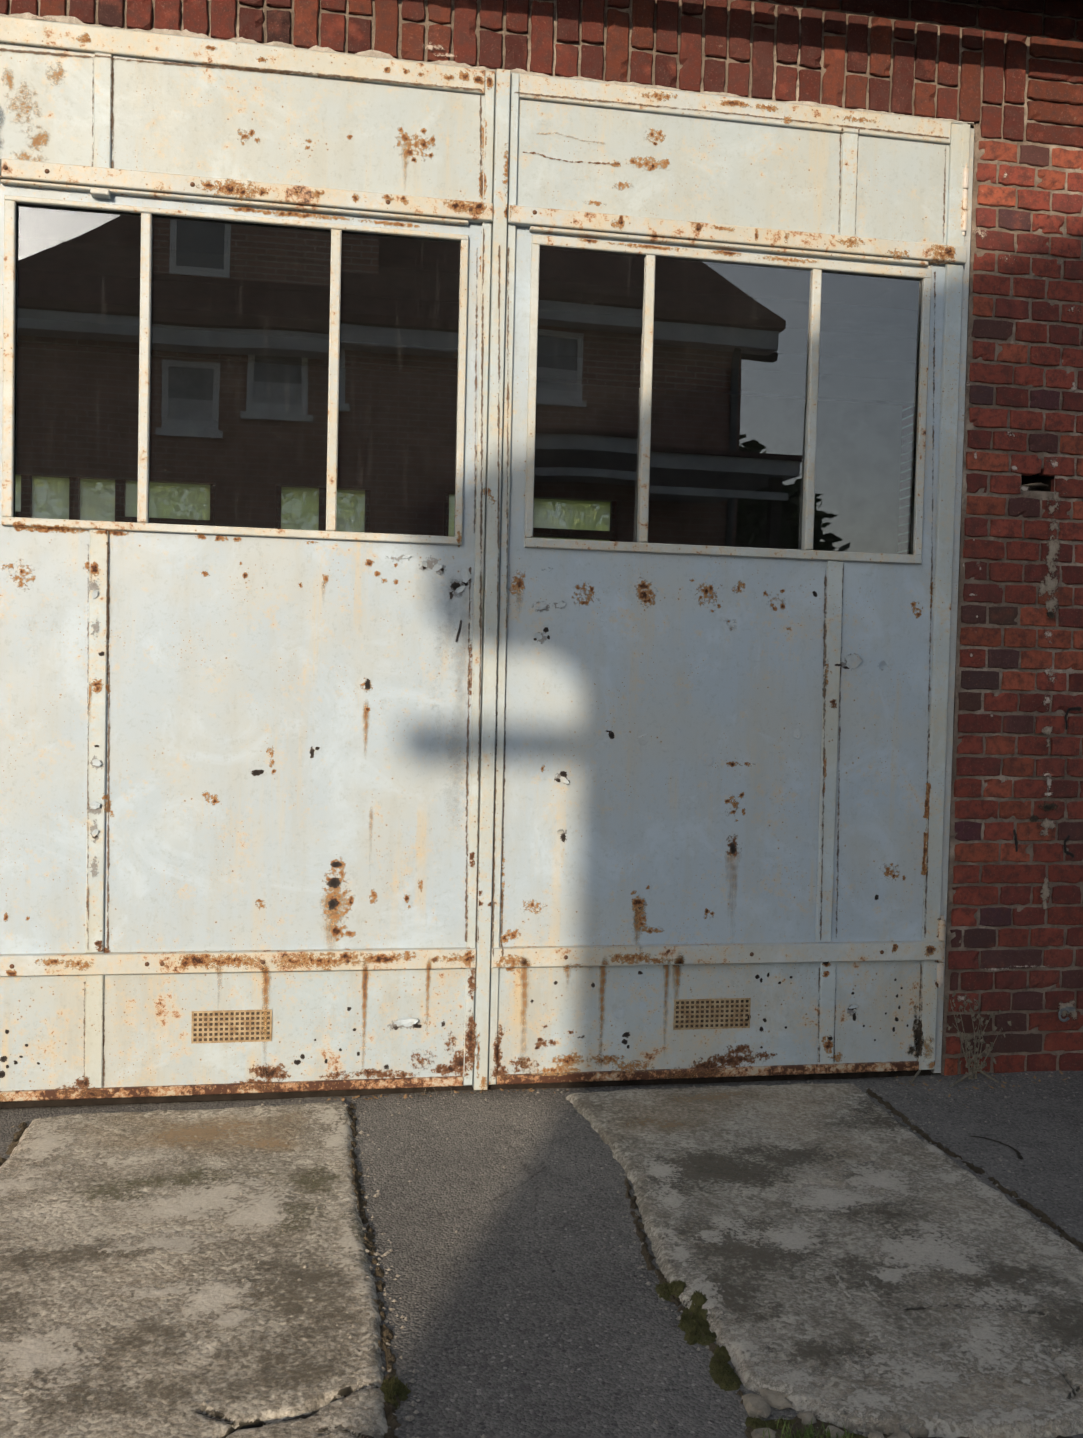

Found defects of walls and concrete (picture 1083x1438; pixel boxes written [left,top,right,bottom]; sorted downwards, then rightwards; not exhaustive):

rust [3,70,49,161]
rust [397,127,435,166]
rust [443,119,670,219]
rust [198,178,420,228]
rust [577,215,680,252]
rust [836,237,864,247]
rust [930,244,956,265]
rust [635,577,656,608]
rust [689,579,745,630]
rust [178,853,777,1091]
rust [55,1076,109,1098]
crack [196,1383,379,1438]